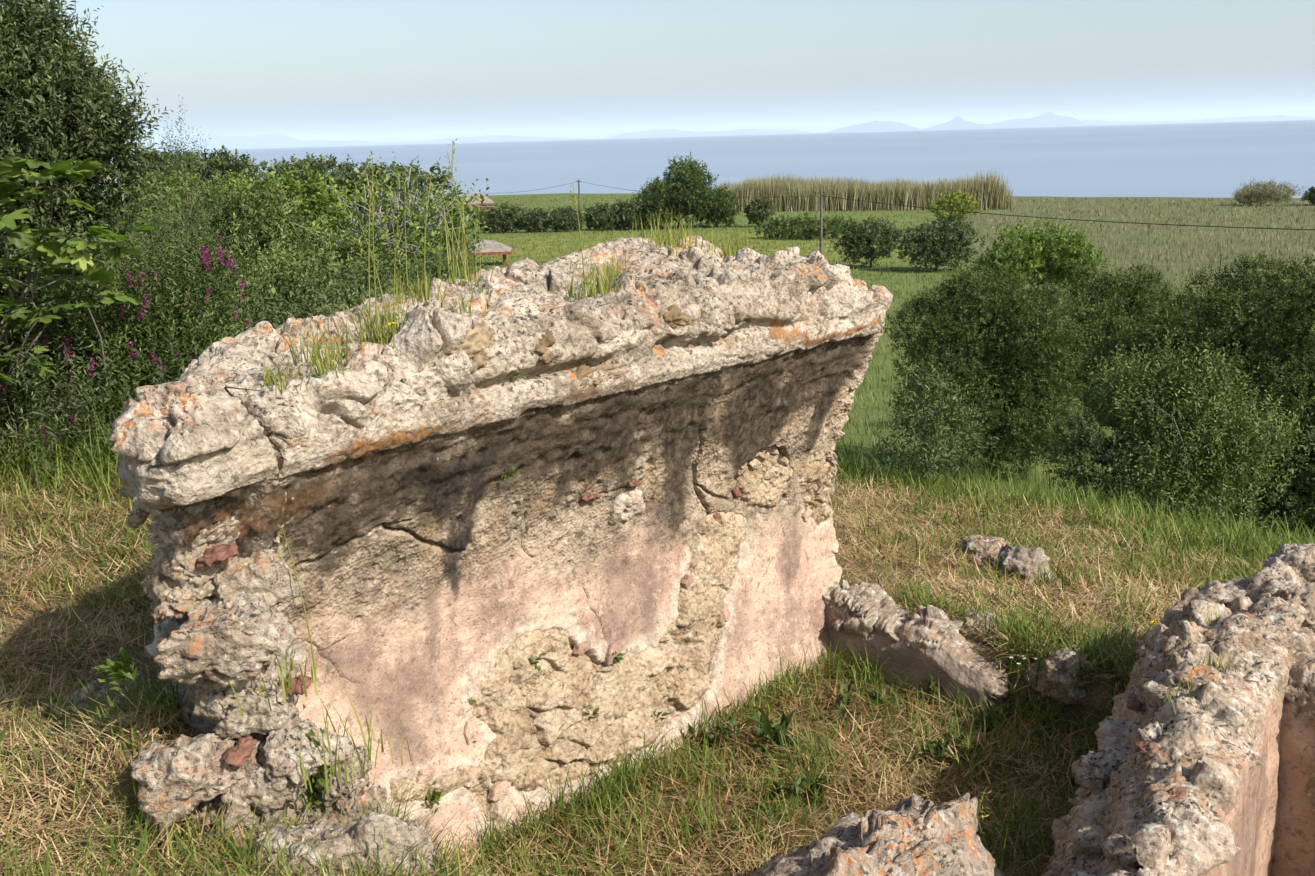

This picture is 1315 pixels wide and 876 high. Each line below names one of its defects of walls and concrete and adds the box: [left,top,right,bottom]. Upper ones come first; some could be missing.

crack [381,510,445,548]
leakage [146,334,871,595]
spalling [390,446,832,821]